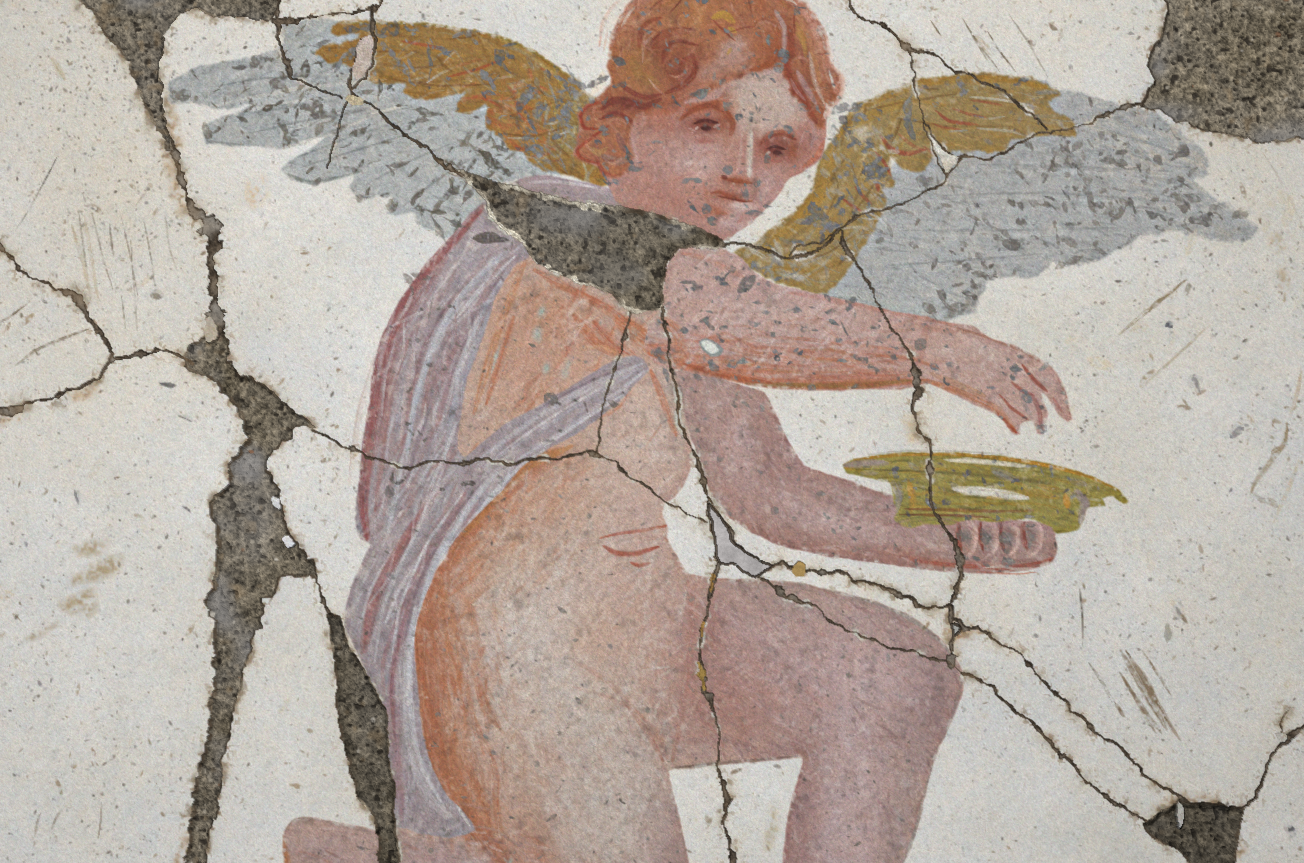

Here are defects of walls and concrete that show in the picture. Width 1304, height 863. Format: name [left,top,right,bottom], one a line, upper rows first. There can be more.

flaking render [78,0,483,152]
crack [272,0,465,177]
crack [0,239,195,418]
crack [170,139,227,342]
crack [312,0,1187,863]
flaking render [354,0,1304,387]
peeling [980,356,1049,434]
flaking render [184,336,317,863]
peeling [957,505,1016,568]
flaking render [327,613,401,863]
flaking render [1143,798,1246,863]
crack [1242,711,1304,810]